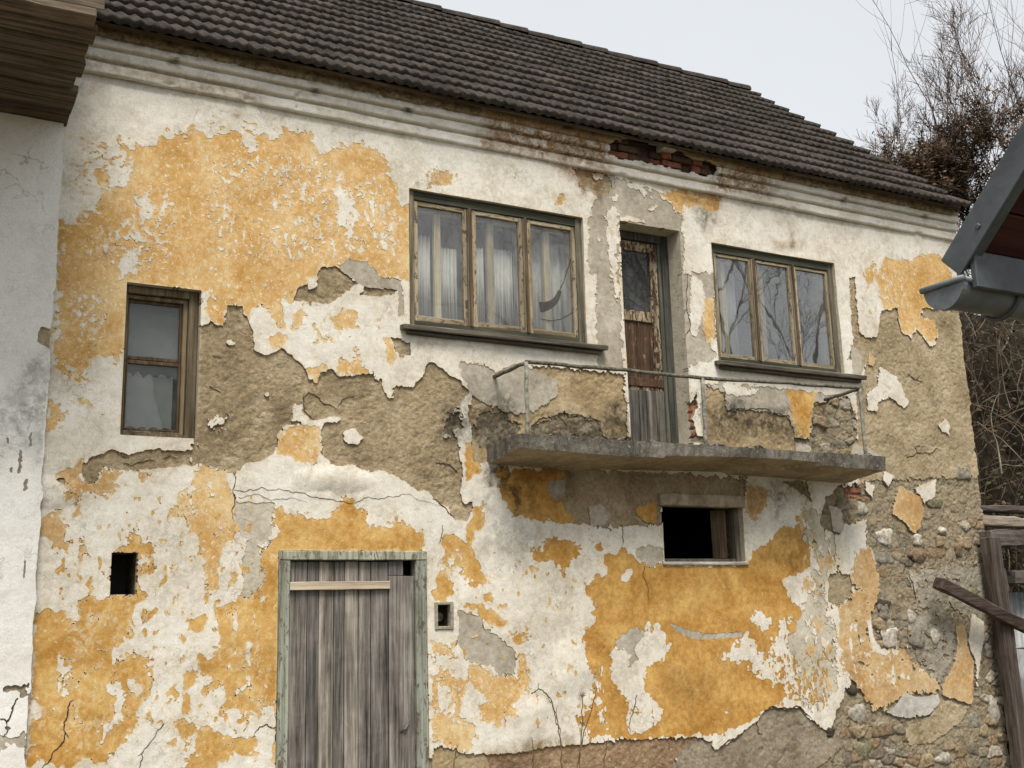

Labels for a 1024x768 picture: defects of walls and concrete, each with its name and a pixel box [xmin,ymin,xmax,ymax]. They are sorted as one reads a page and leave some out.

flaking render [608,139,717,177]
peeling [3,116,629,768]
peeling [427,253,1011,768]
crack [0,698,18,737]
crack [42,700,73,768]